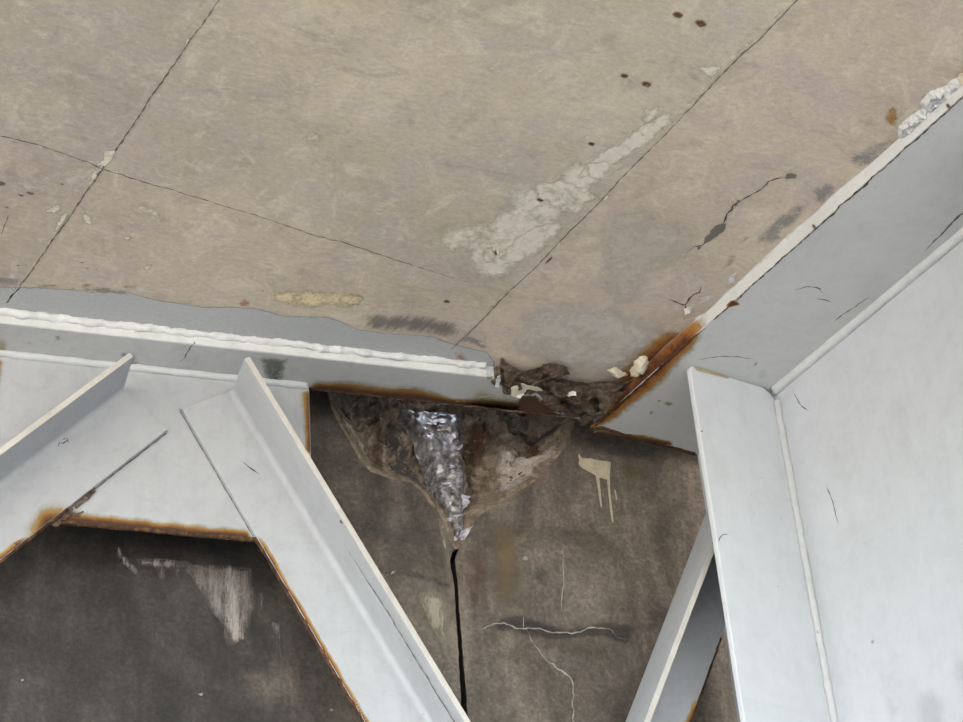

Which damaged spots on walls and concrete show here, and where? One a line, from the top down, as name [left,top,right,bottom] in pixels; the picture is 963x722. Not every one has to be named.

rust [302,97,963,457]
crack [669,288,701,315]
crack [685,173,796,257]
spalling [328,392,576,549]
rust [0,508,369,722]
water stain [117,547,263,643]
crack [451,560,625,722]
crack [559,542,567,609]